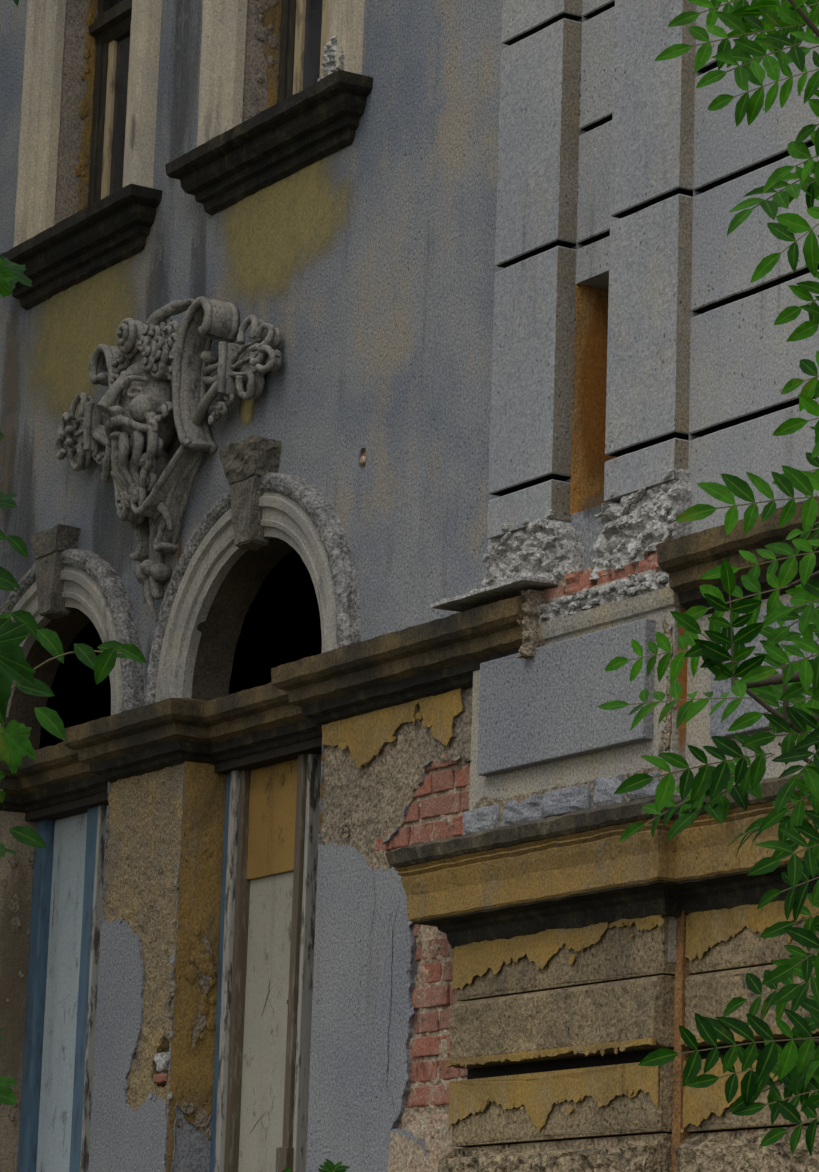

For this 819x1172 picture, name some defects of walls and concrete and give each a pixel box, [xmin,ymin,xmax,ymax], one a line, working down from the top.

flaking render [481,468,693,624]
flaking render [321,620,677,870]
flaking render [99,763,217,1172]
flaking render [397,915,664,1153]
flaking render [680,1057,757,1133]
flaking render [679,1026,794,1047]
flaking render [685,896,819,961]